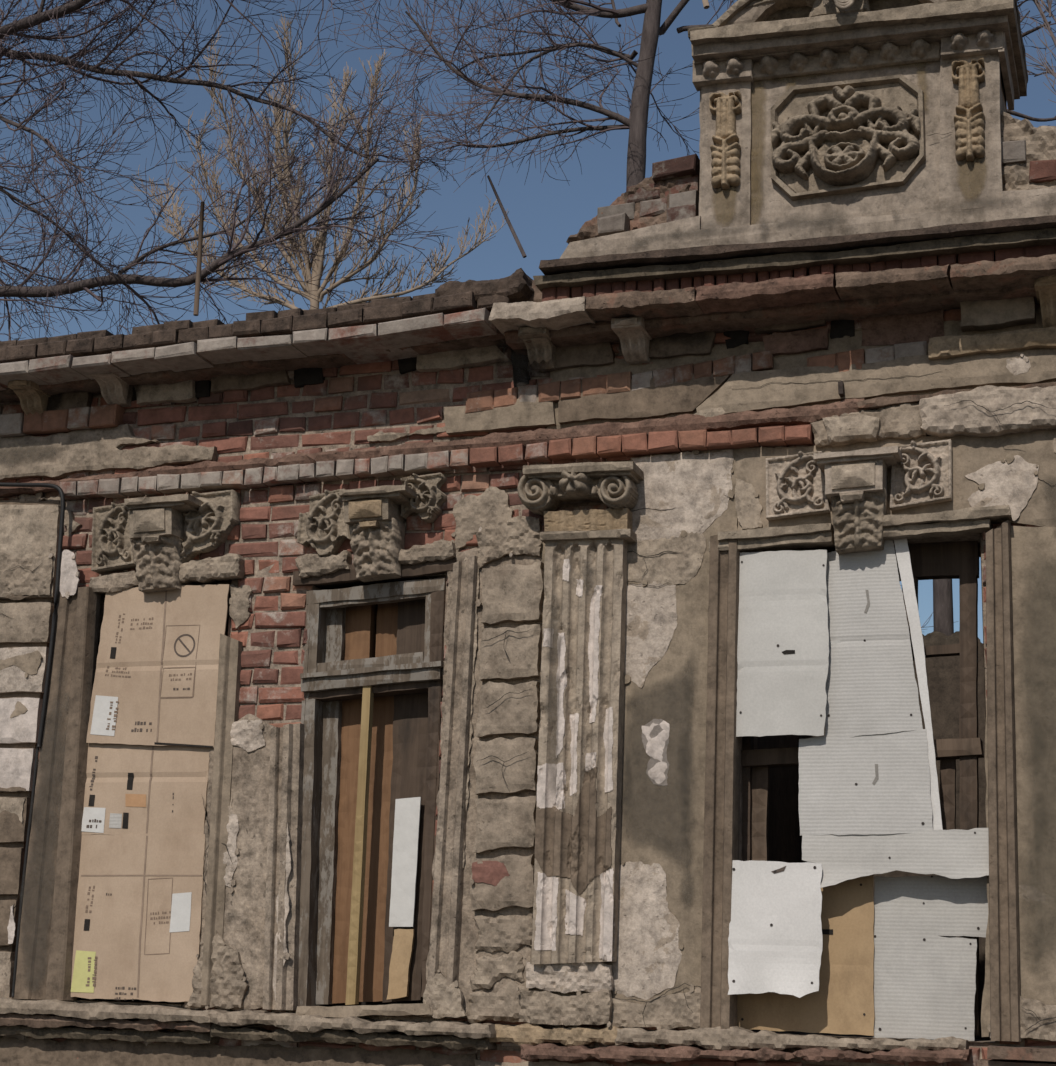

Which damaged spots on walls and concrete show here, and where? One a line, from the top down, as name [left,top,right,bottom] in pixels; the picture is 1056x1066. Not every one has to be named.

spalling [1001,109,1056,191]
flaking render [965,453,1039,521]
flaking render [624,449,763,688]
flaking render [464,516,542,811]
peeling [515,559,701,1030]
flaking render [187,931,249,1010]
flaking render [1020,996,1056,1041]